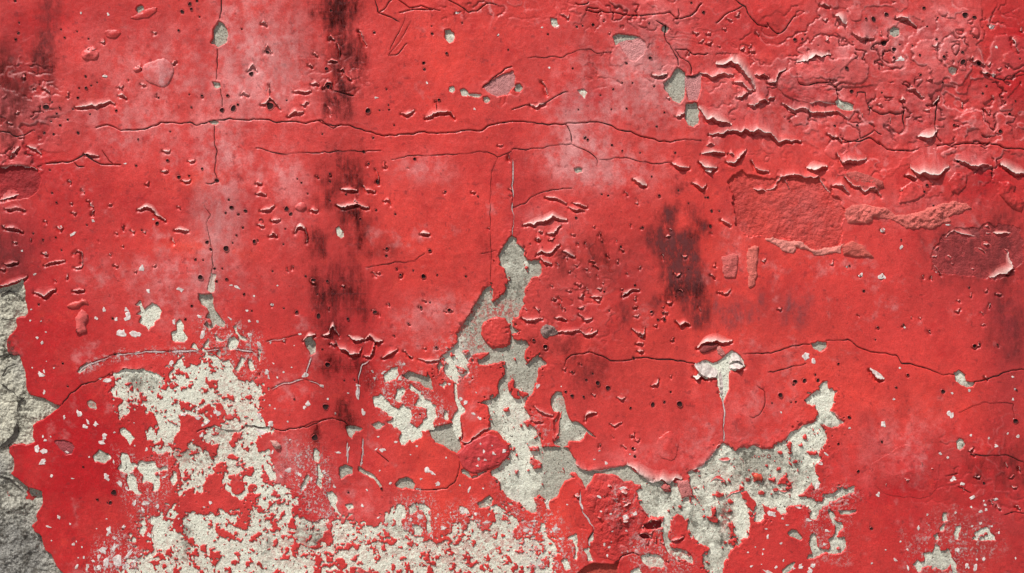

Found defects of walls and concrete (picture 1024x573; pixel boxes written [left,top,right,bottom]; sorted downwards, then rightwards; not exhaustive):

water stain [312,0,365,118]
peeling [609,32,647,61]
crack [47,152,114,167]
crack [97,49,701,285]
peeling [652,31,884,294]
peeling [899,127,1024,203]
water stain [646,206,717,326]
peeling [922,222,1023,311]
spalling [0,249,88,573]
peeling [93,193,856,573]
crack [564,352,688,366]
crack [750,339,1020,418]